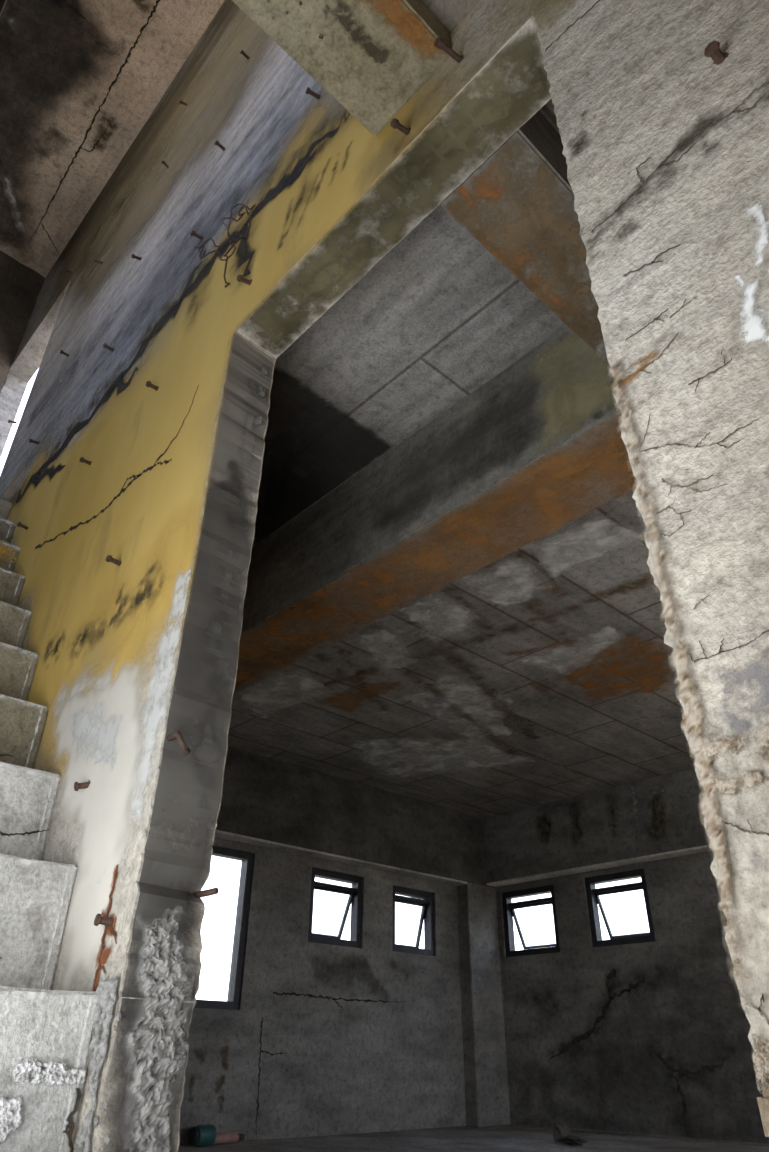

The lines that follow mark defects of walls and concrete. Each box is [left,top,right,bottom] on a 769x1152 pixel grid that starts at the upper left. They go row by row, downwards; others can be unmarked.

leakage [0,0,112,250]
leakage [92,116,116,150]
corrosion [366,0,444,53]
crack [16,113,350,503]
crack [34,385,199,550]
leakage [45,375,652,1152]
corrosion [235,424,636,687]
spalling [609,362,769,980]
crack [641,414,751,452]
spalling [0,1097,22,1142]
corrosion [92,869,118,992]
spalling [126,910,193,1152]